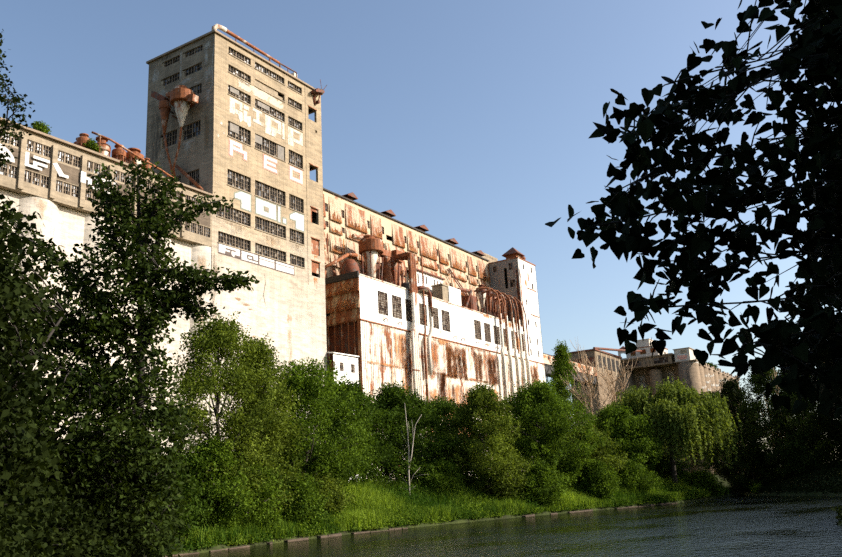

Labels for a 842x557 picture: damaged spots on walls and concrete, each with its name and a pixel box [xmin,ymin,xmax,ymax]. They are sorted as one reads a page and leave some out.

corrosion [323,208,382,262]
corrosion [388,239,490,292]
corrosion [502,268,529,327]
corrosion [367,328,410,395]
corrosion [420,331,507,406]